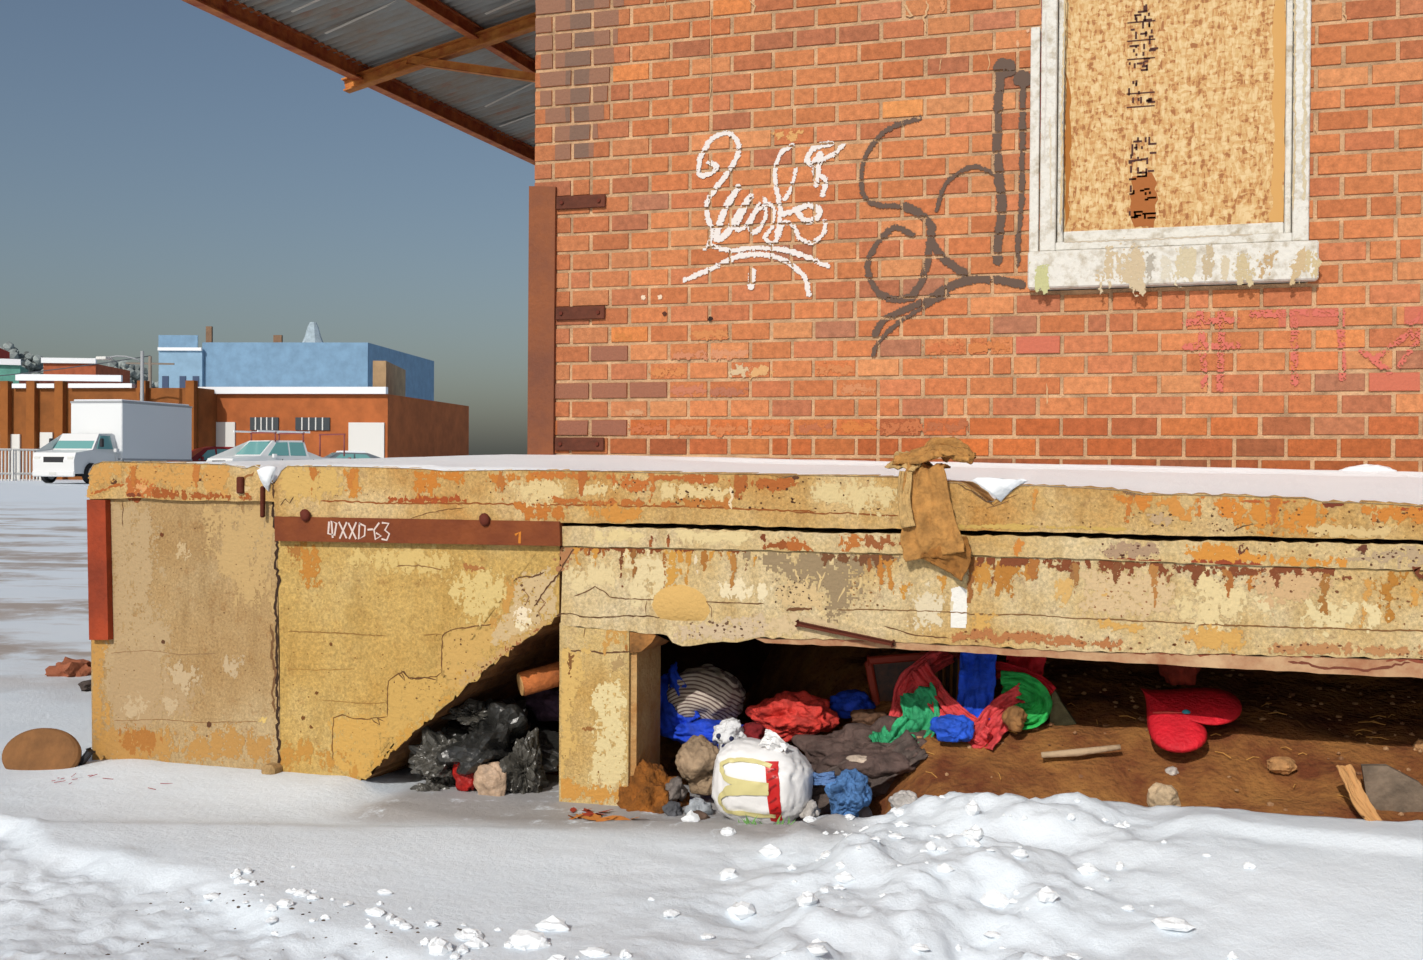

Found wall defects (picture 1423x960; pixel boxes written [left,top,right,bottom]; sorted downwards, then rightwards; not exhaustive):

spalling [110,476,161,498]
rust [388,470,467,505]
rust [486,471,799,543]
crack [114,481,898,763]
rust [573,534,913,600]
spalling [673,578,895,648]
rust [952,626,1238,657]
spalling [1079,511,1180,622]
rust [967,491,1423,628]
spalling [1238,543,1333,616]
rust [1267,641,1423,663]
spalling [1345,545,1423,569]